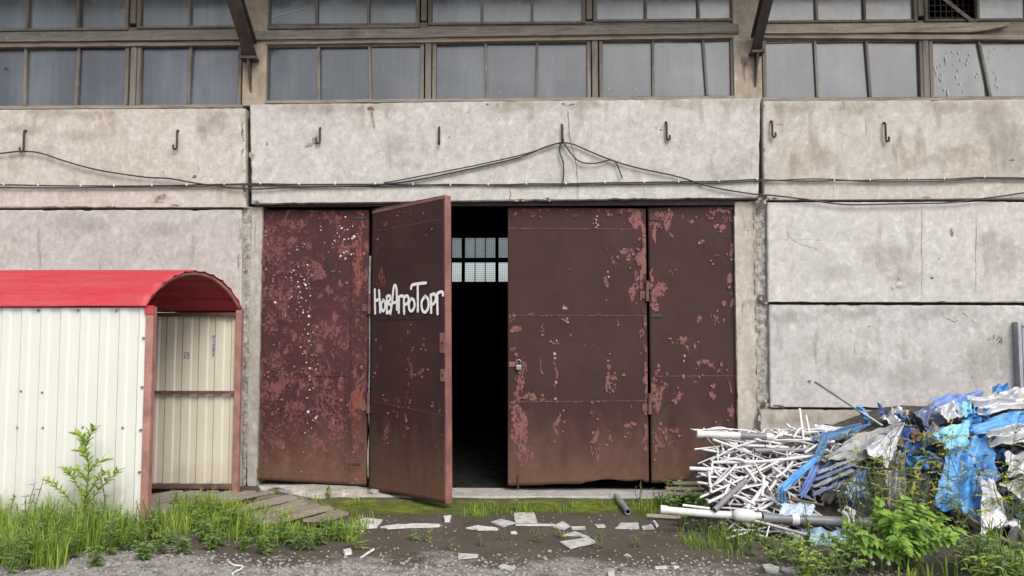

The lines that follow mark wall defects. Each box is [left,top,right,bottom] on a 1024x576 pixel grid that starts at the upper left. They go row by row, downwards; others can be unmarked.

peeling [260,211,377,461]
peeling [509,313,577,467]
peeling [590,207,737,463]